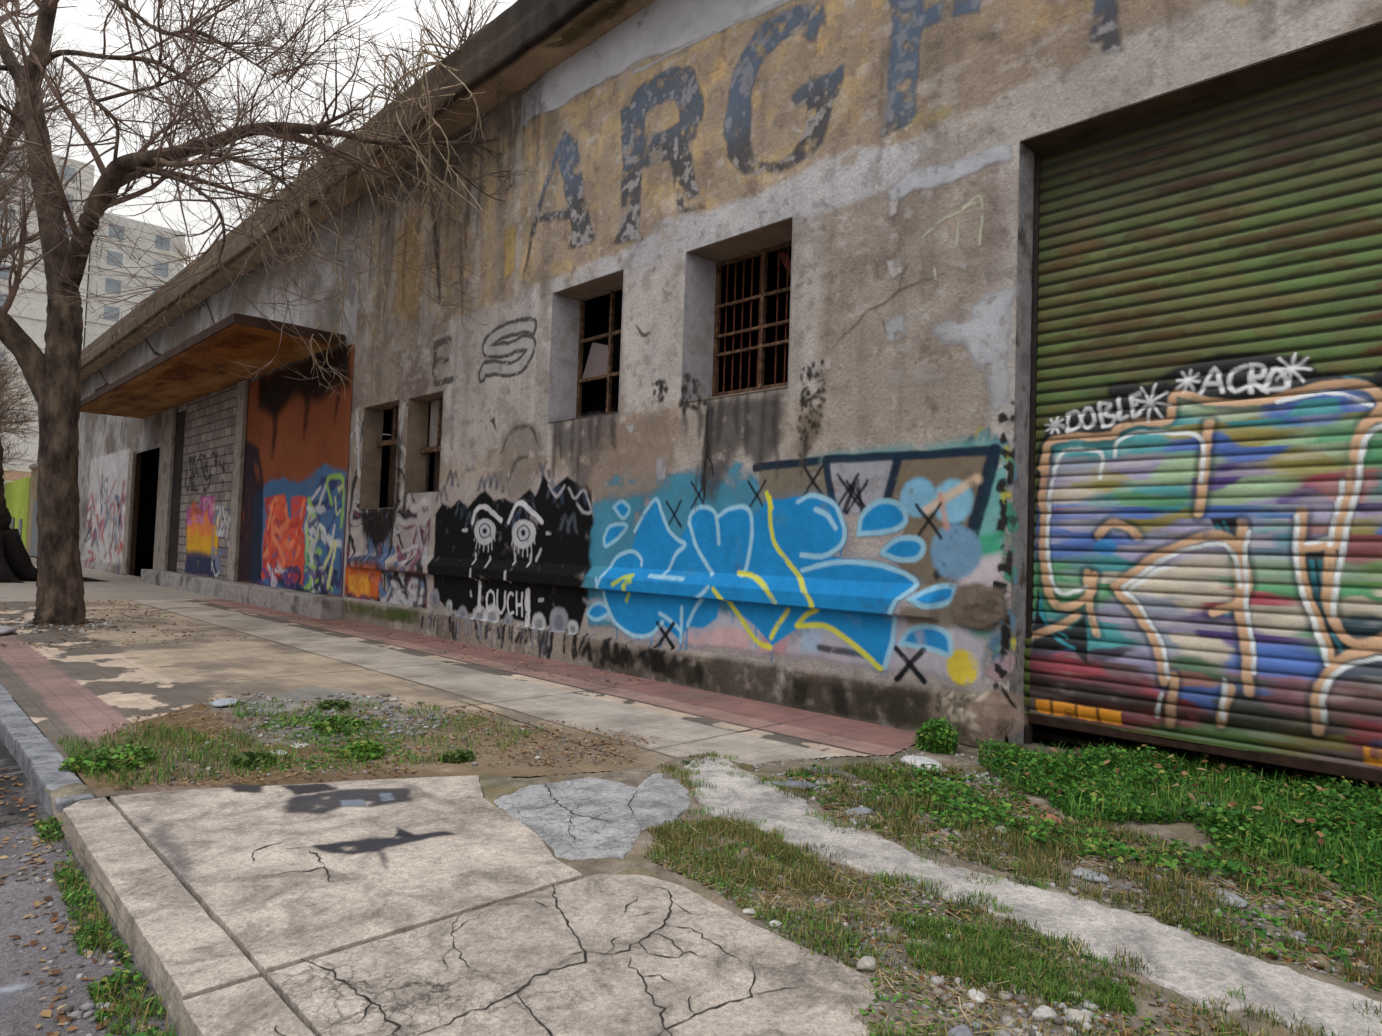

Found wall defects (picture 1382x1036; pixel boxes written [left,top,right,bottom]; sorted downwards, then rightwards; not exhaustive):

water stain [782,675,929,727]
crack [301,884,797,1036]